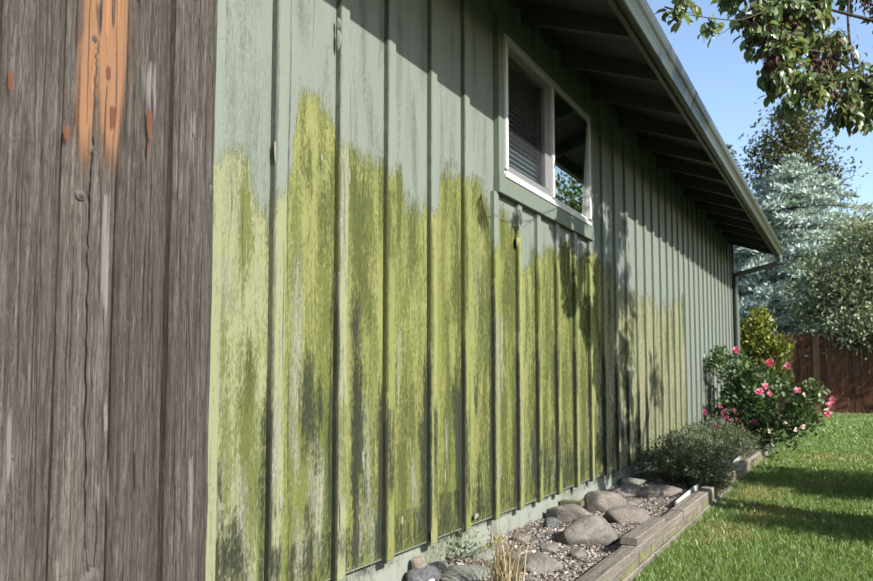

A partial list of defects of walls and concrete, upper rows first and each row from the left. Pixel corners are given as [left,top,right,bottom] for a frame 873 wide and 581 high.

damp [215,515,247,581]
damp [259,287,649,581]